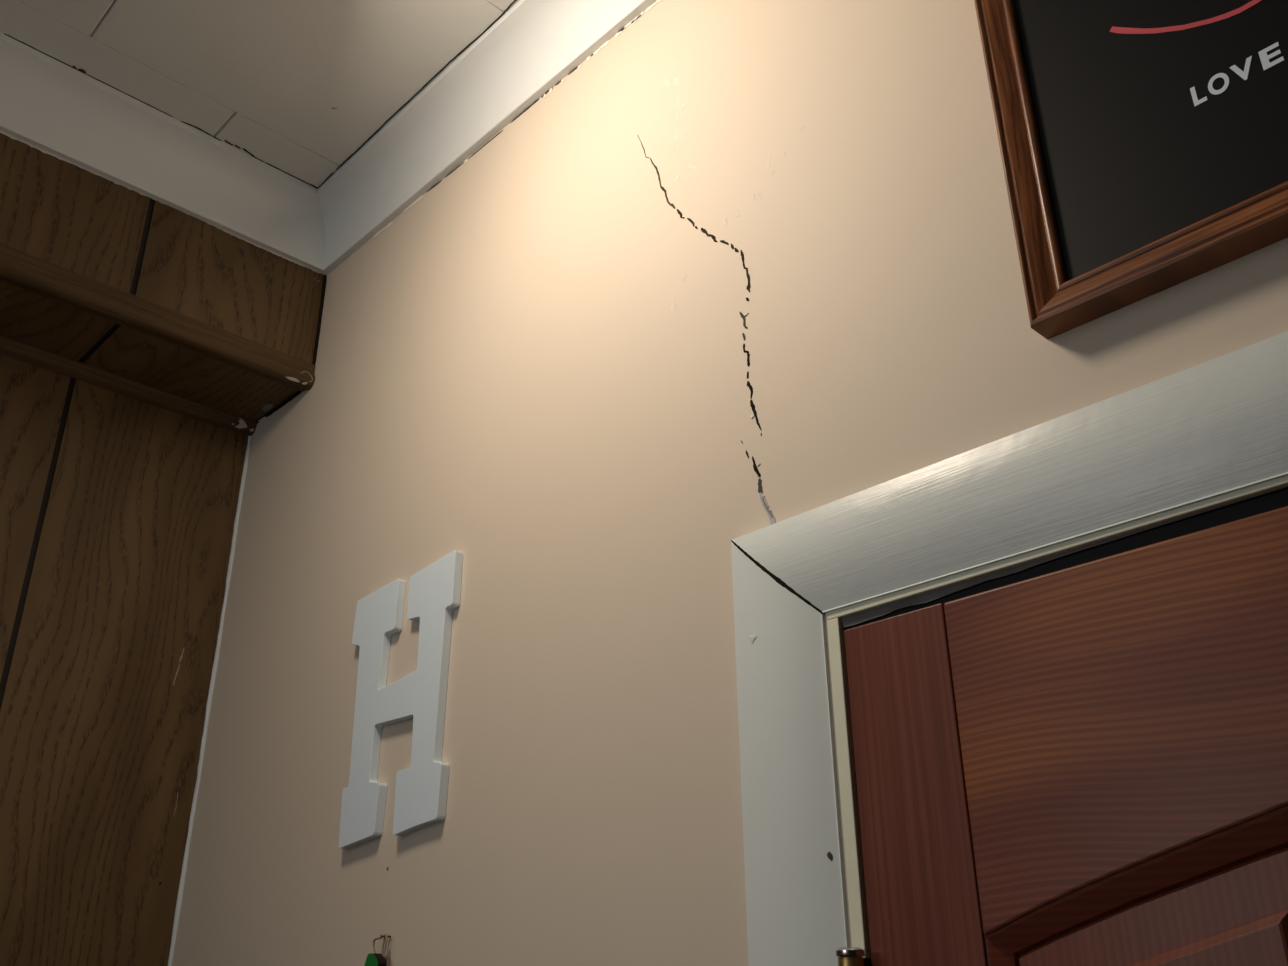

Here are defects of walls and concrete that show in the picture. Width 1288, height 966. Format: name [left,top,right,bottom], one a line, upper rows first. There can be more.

crack [637,135,776,525]
crack [731,540,823,614]